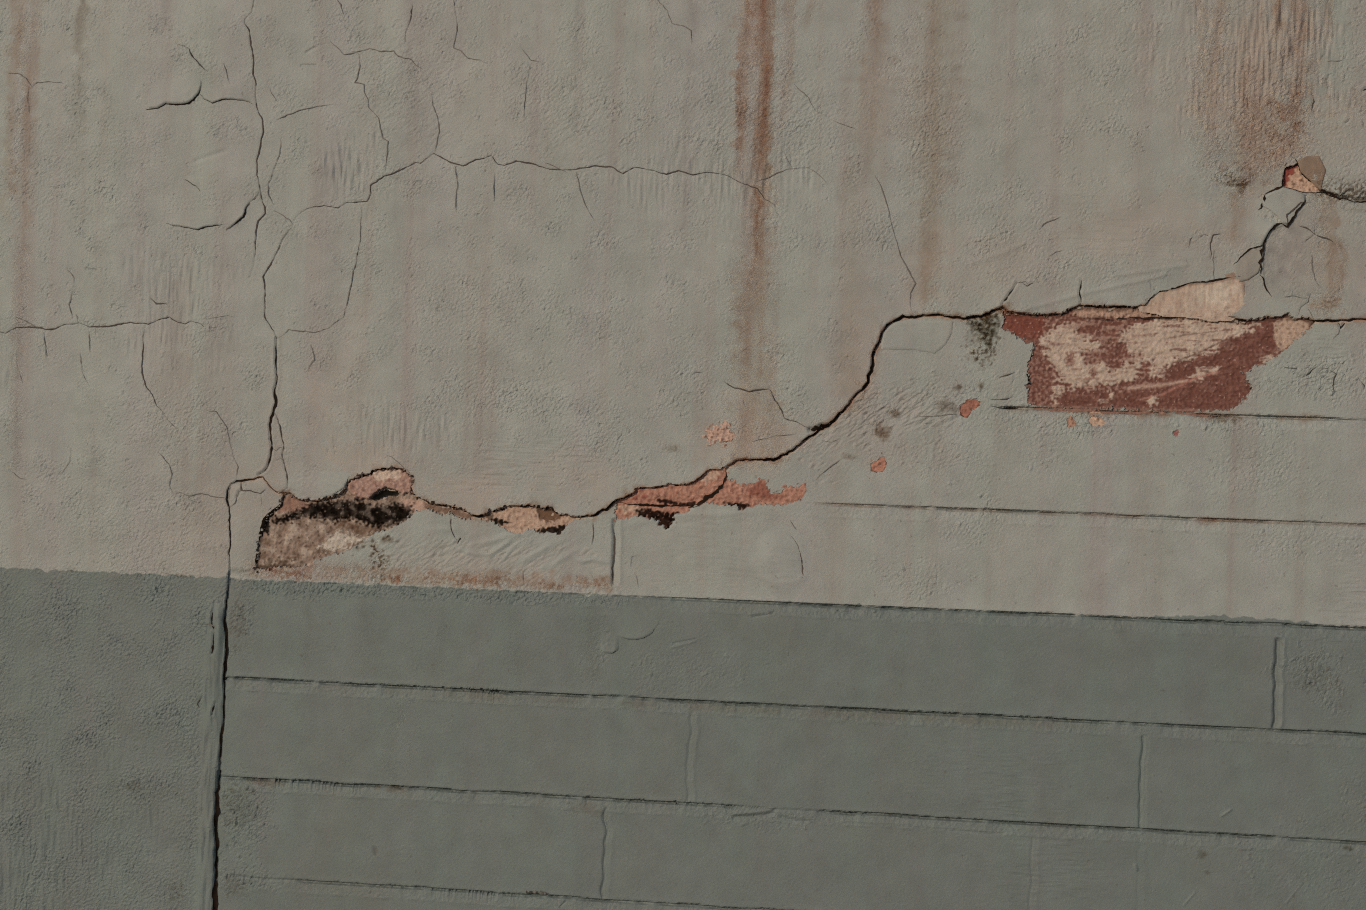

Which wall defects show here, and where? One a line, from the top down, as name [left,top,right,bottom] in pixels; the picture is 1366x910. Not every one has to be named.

crack [2,267,229,428]
spalling [1002,156,1366,437]
crack [1228,191,1366,335]
spalling [255,467,582,573]
crack [159,0,1151,910]
spalling [614,466,806,530]